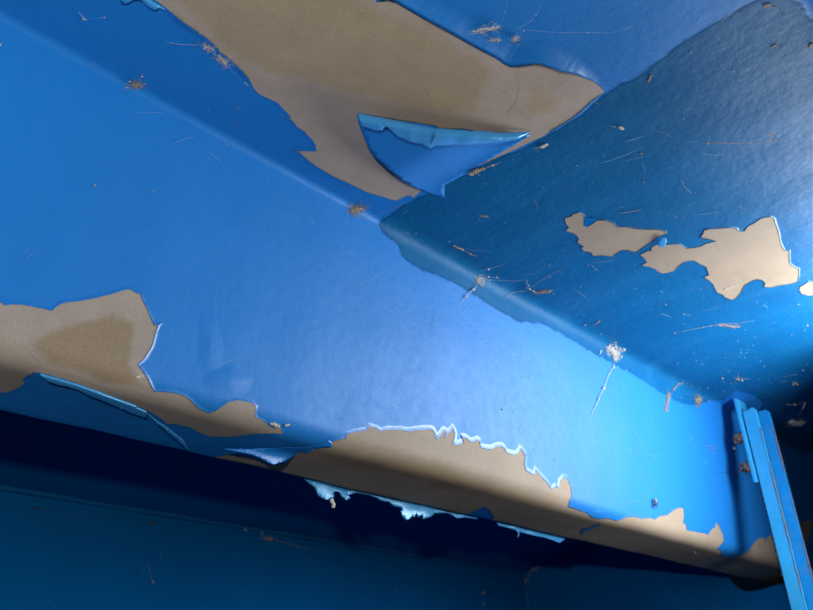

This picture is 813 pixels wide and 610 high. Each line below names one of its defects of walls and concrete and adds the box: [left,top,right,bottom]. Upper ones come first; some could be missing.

peeling [119,0,612,202]
spalling [564,212,813,300]
spalling [0,286,286,451]
spalling [217,423,785,585]
spalling [799,518,812,548]